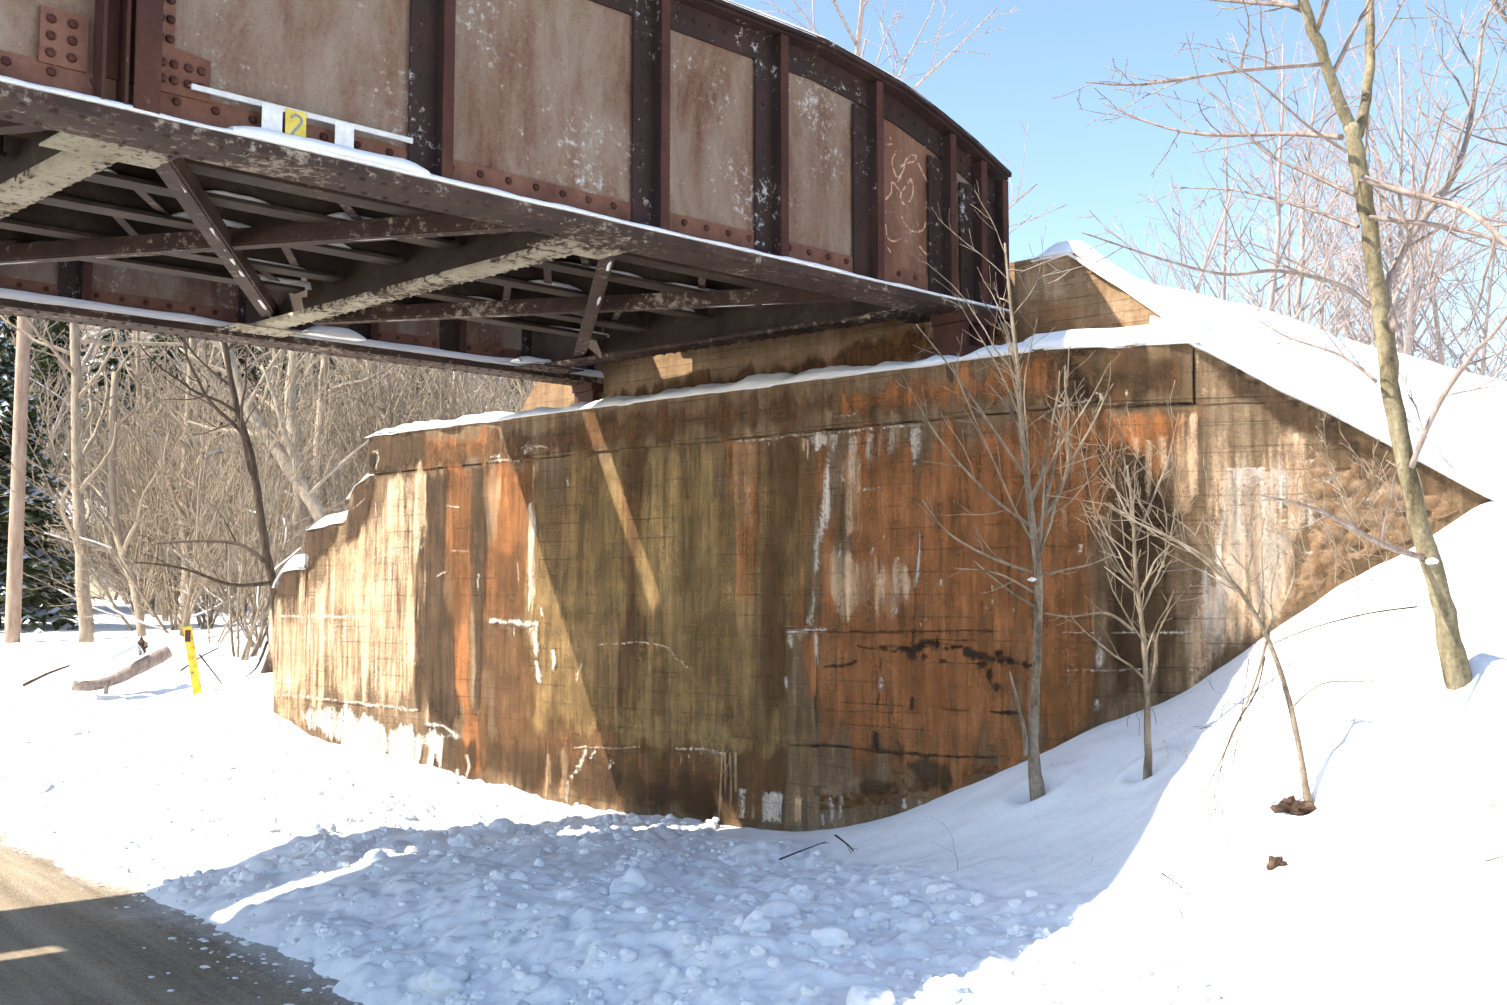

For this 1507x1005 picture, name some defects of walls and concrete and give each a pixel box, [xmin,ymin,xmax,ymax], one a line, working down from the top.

water stain [269,430,801,827]
rust [424,353,1167,796]
water stain [740,413,920,716]
crack [785,628,1032,759]
water stain [1096,368,1385,689]